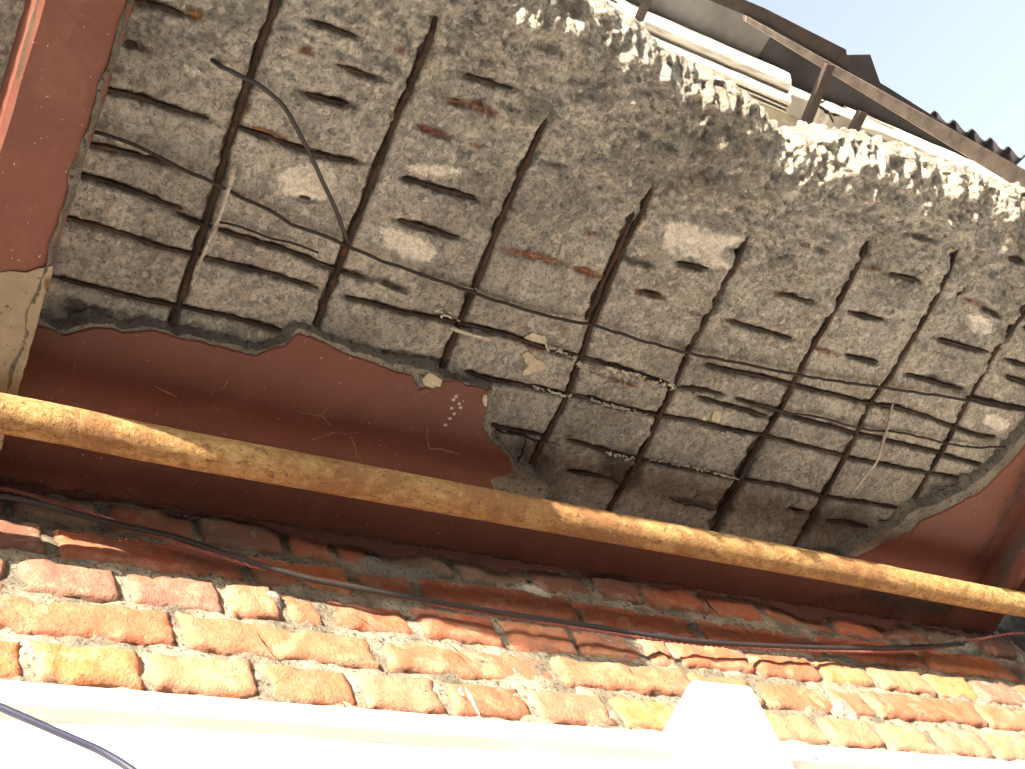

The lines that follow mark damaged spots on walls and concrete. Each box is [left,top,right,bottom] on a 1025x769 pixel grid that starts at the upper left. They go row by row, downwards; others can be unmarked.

rust [418,125,446,138]
spalling [0,0,1025,552]